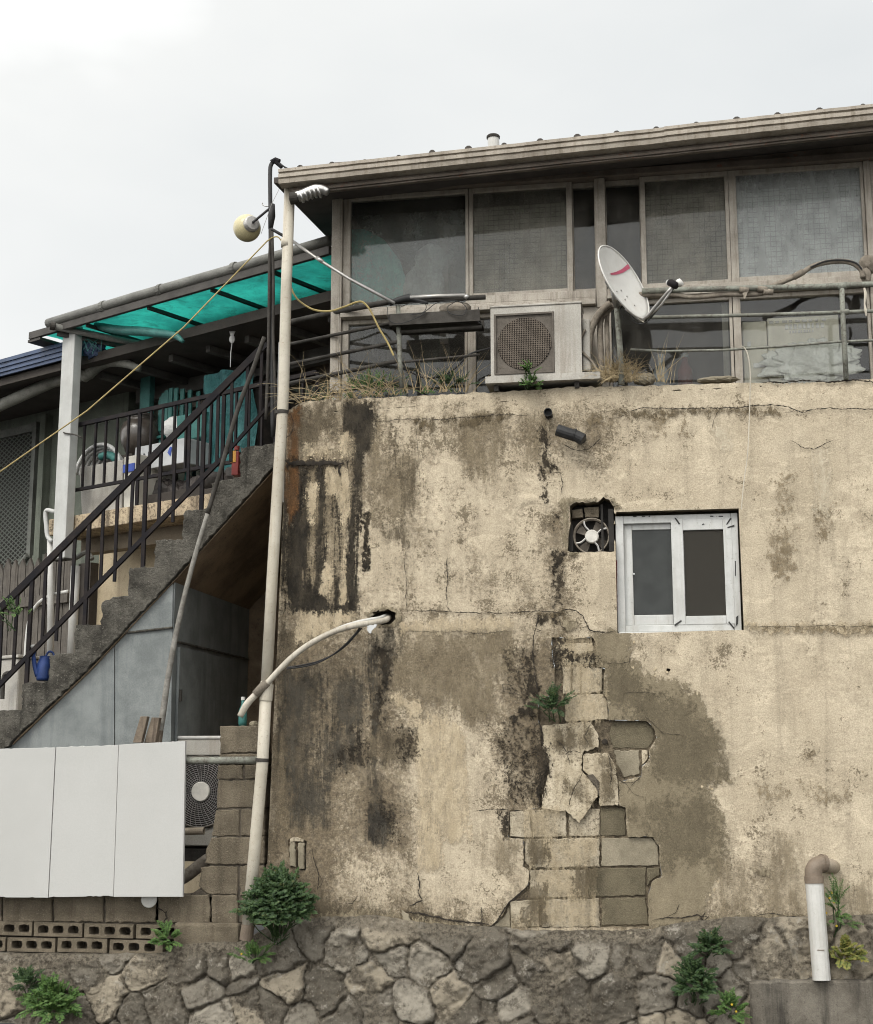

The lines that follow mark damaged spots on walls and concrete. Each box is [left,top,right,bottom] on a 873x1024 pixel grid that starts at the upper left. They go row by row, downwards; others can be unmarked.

damp [523,412,560,531]
crack [565,379,873,451]
damp [271,398,542,871]
crack [400,548,617,696]
spalling [493,619,806,931]
crack [408,873,528,927]
crack [655,905,709,920]